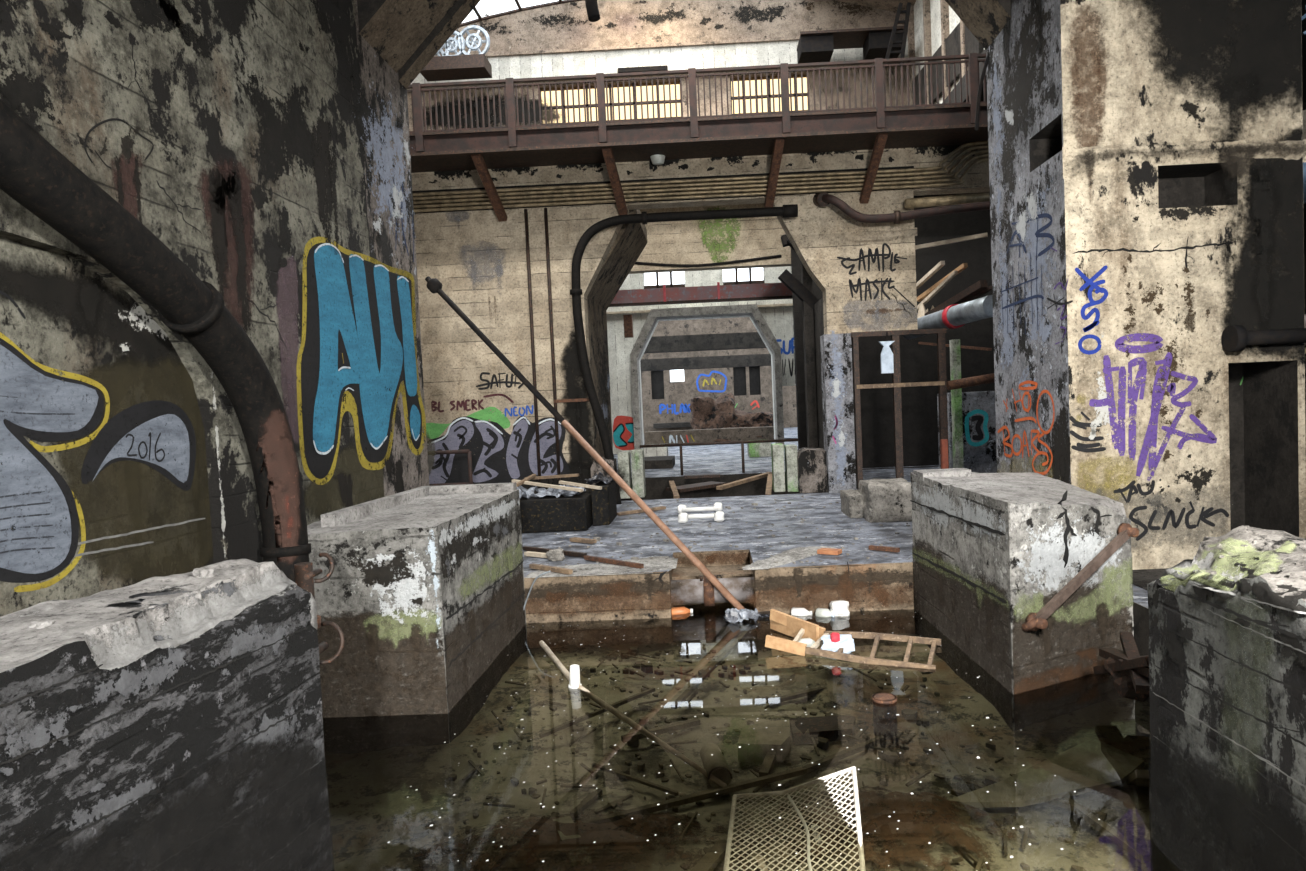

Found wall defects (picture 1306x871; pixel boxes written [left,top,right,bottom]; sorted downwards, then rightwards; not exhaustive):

rust [1069,6,1107,148]
rust [111,152,144,223]
crack [1073,236,1233,268]
crack [1057,491,1112,568]
water stain [1275,541,1295,553]
spalling [0,567,318,776]
water stain [1,551,750,871]
peeling [64,773,165,831]